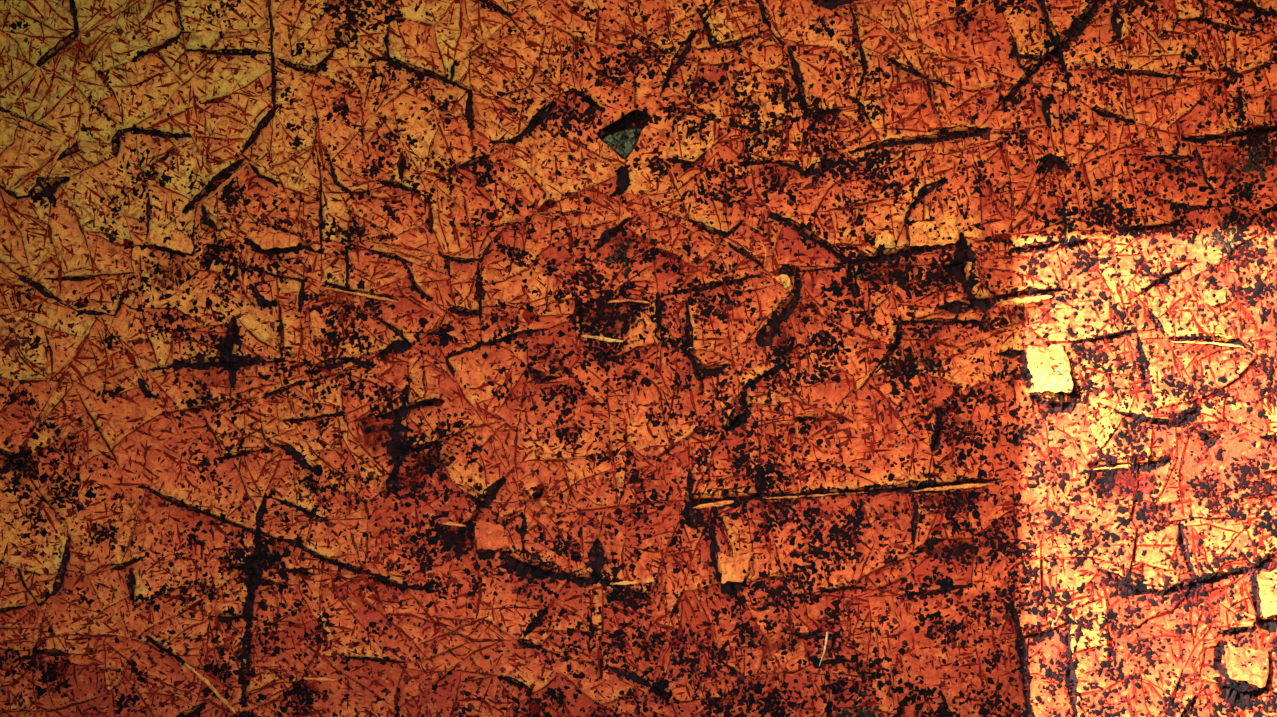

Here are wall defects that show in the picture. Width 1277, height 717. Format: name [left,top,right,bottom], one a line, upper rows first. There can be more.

crack [1213,177,1277,257]
peeling [996,295,1057,328]
crack [1041,293,1100,320]
peeling [1027,344,1073,393]
crack [1044,483,1060,511]
crack [1065,484,1111,514]
crack [1006,570,1031,587]
crack [338,695,377,717]
crack [954,681,986,707]